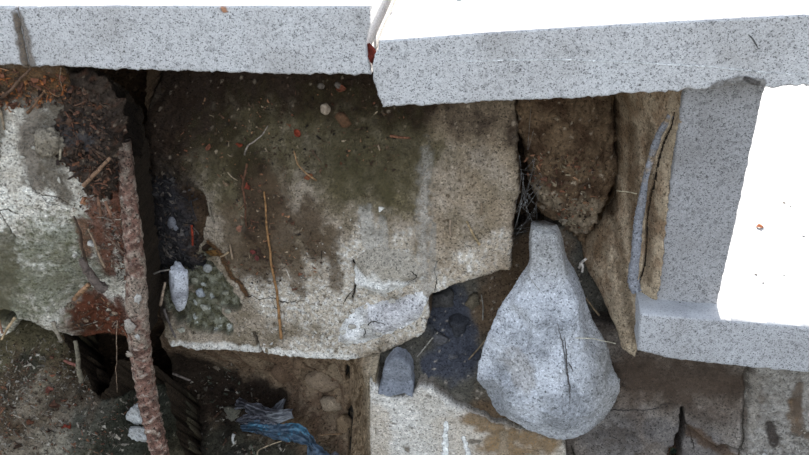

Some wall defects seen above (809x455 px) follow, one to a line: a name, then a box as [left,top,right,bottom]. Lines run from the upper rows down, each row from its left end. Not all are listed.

damp [222,166,343,295]
crack [640,112,675,280]
spalling [165,248,241,333]
crack [612,367,749,455]
spalling [765,421,779,448]